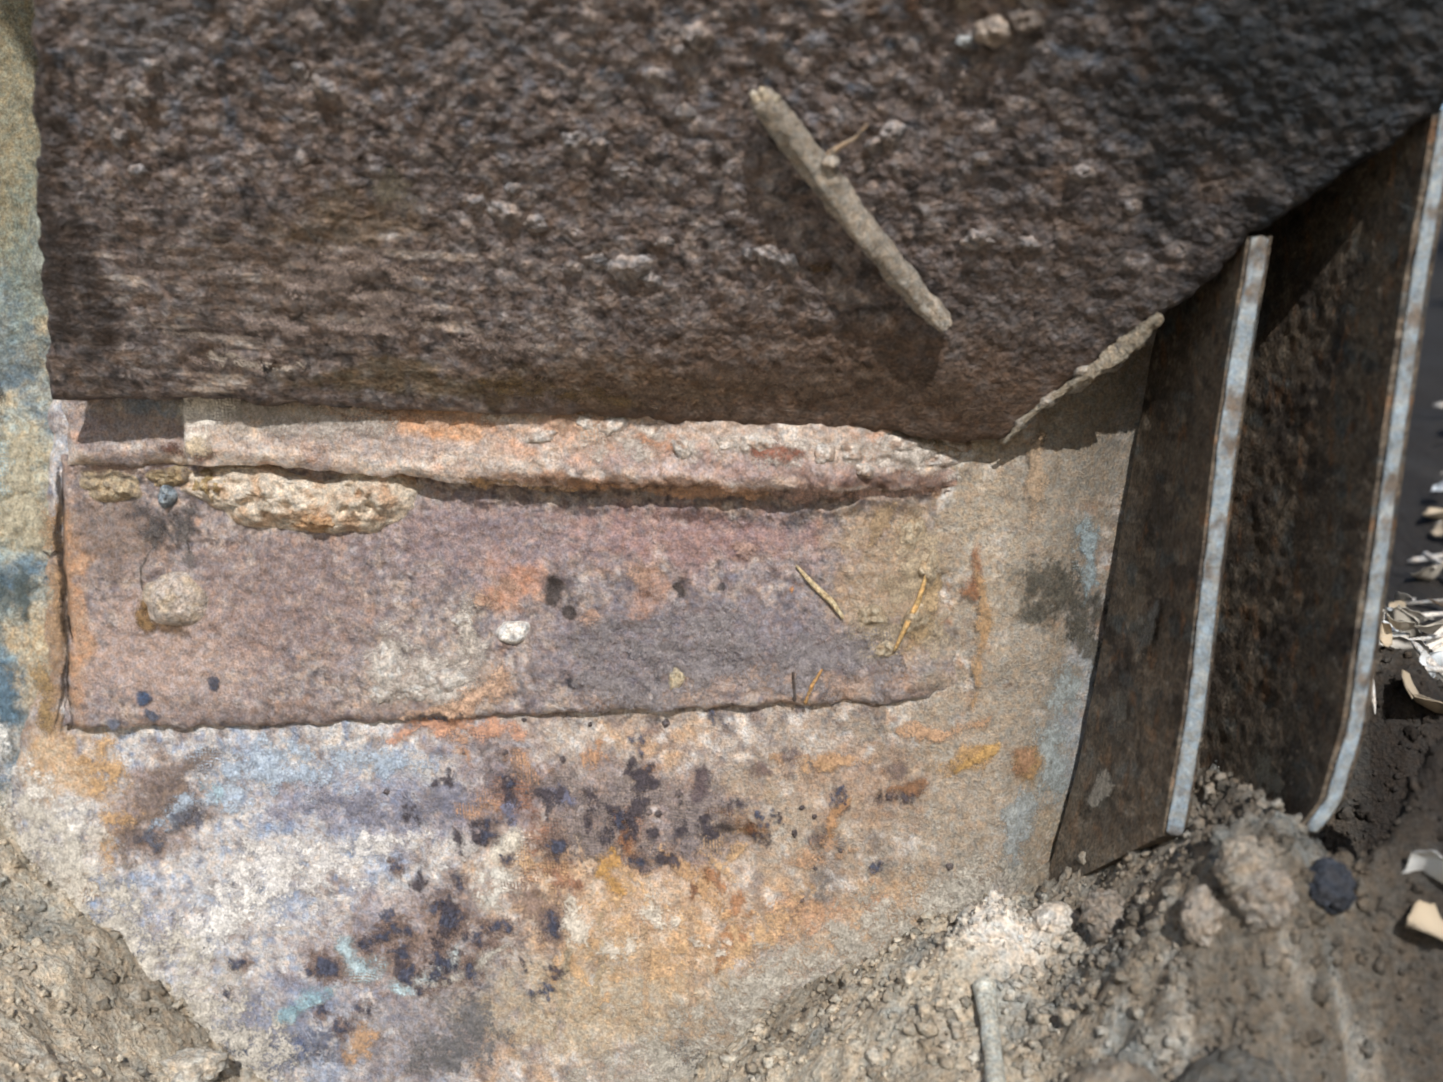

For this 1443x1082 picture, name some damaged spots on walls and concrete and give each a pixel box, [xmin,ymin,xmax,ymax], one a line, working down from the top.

corrosion [1025,430,1049,527]
crack [43,467,73,725]
corrosion [386,548,1045,1040]
damp [561,894,638,963]
damp [640,892,682,930]
damp [689,937,731,957]